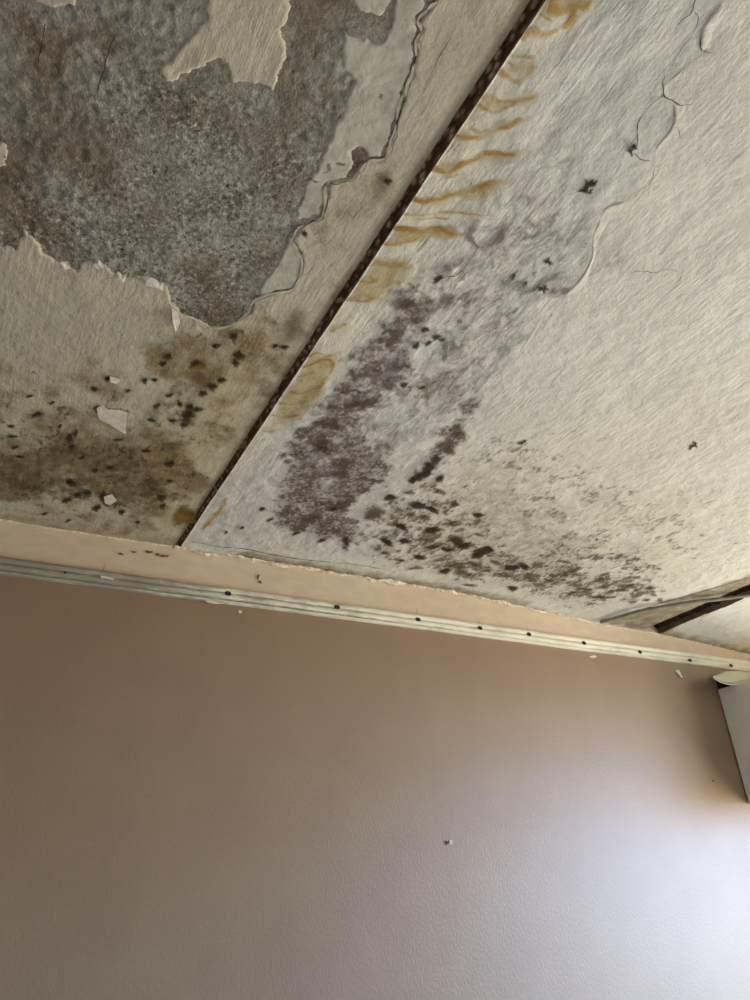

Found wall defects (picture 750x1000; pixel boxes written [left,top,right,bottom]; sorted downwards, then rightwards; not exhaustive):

crack [386,30,453,159]
crack [633,0,720,185]
spalling [0,0,438,334]
water stain [466,220,511,248]
water stain [578,179,598,195]
water stain [186,360,207,382]
water stain [212,330,246,367]
water stain [0,377,227,525]
water stain [259,284,666,612]